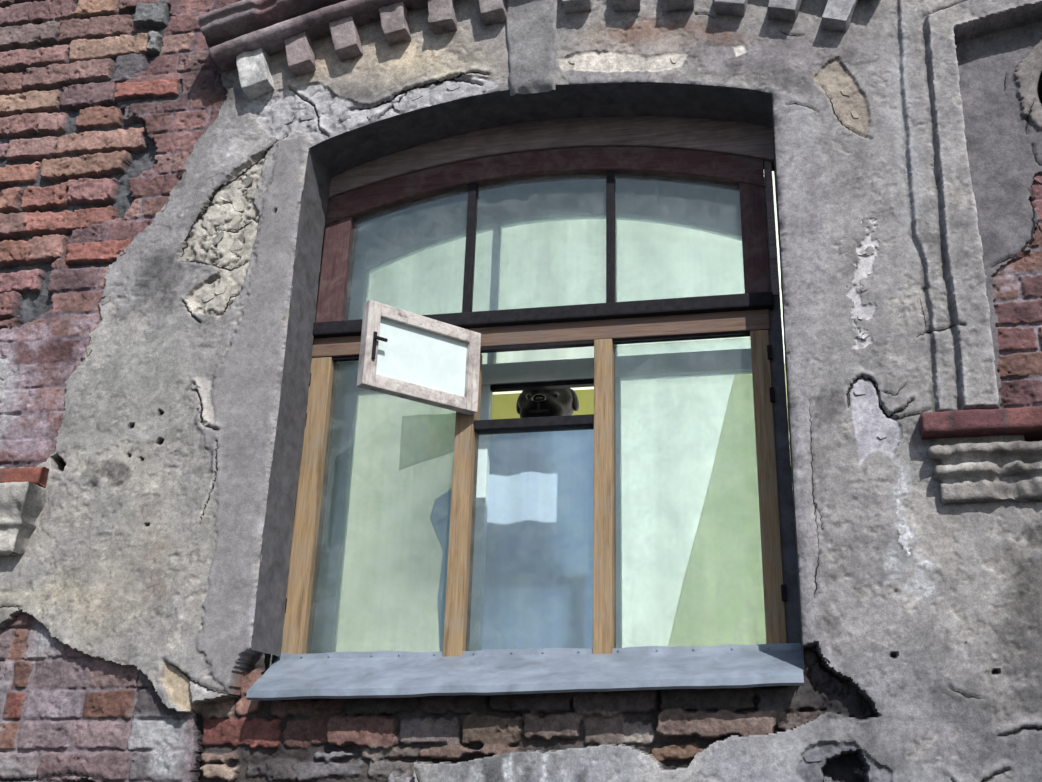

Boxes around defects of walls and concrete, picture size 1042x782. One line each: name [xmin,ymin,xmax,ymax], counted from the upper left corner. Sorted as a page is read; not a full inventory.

crack [290,89,329,137]
crack [352,72,489,118]
spalling [814,55,872,138]
spalling [0,0,241,471]
spalling [992,171,1042,409]
crack [196,390,218,524]
crack [809,407,823,597]
spalling [0,609,879,782]
spalling [796,740,894,782]
crack [1003,727,1042,736]